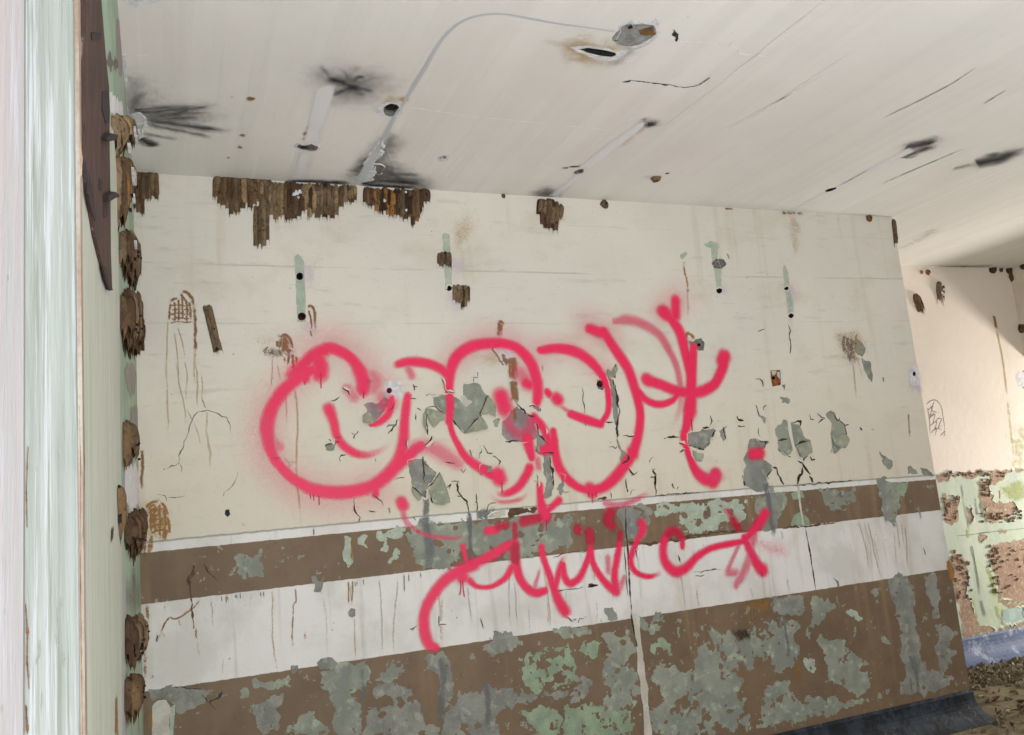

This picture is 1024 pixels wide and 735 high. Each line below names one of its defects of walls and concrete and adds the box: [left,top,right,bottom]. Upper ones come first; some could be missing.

peeling [109,92,147,134]
crack [624,78,709,88]
peeling [124,363,138,428]
corrosion [165,290,212,464]
corrosion [842,336,862,390]
crack [169,400,231,471]
peeling [824,408,850,454]
peeling [125,457,139,511]
peeling [343,380,575,571]
peeling [617,408,814,541]
peeling [240,449,1024,735]
peeling [148,685,213,735]